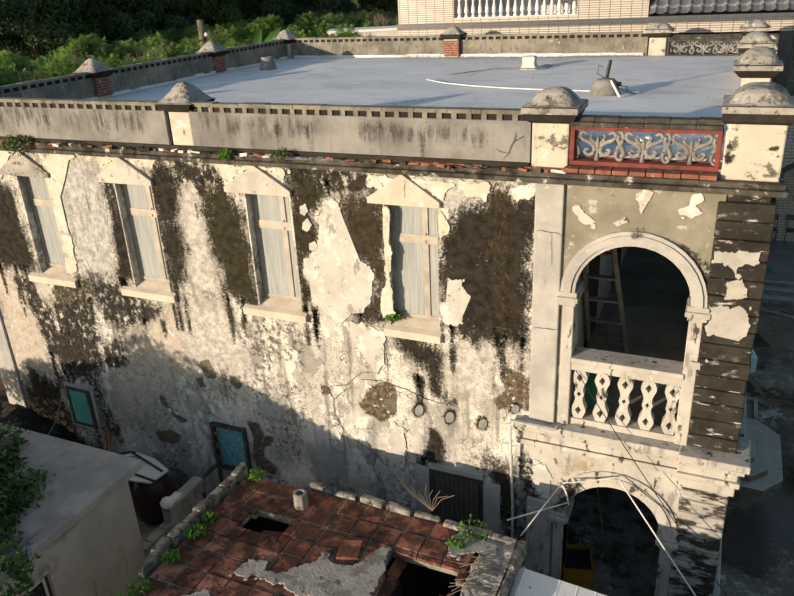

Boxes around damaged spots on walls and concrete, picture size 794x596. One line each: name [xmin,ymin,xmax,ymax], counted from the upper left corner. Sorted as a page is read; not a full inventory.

water stain [271,156,373,198]
flaking render [572,205,596,229]
flaking render [636,190,654,214]
flaking render [678,193,704,219]
water stain [0,160,222,450]
water stain [393,181,535,408]
flaking render [705,250,761,342]
flaking render [300,198,407,468]
flaking render [193,359,242,392]
flaking render [246,420,277,475]